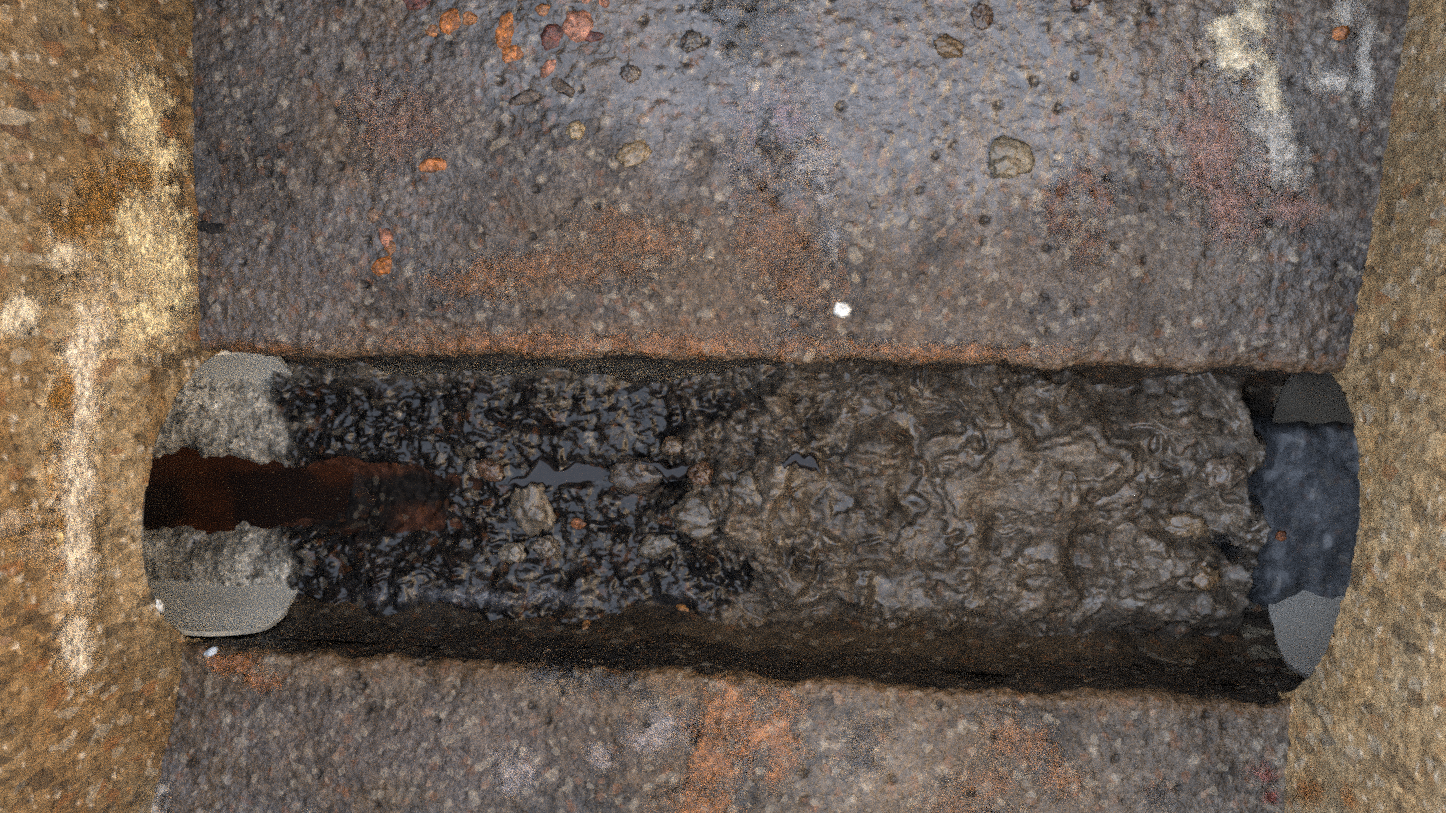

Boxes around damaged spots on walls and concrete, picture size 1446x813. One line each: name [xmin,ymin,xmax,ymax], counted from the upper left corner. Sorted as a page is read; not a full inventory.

rust [589,216,692,257]
rust [426,251,599,297]
rust [678,679,804,813]